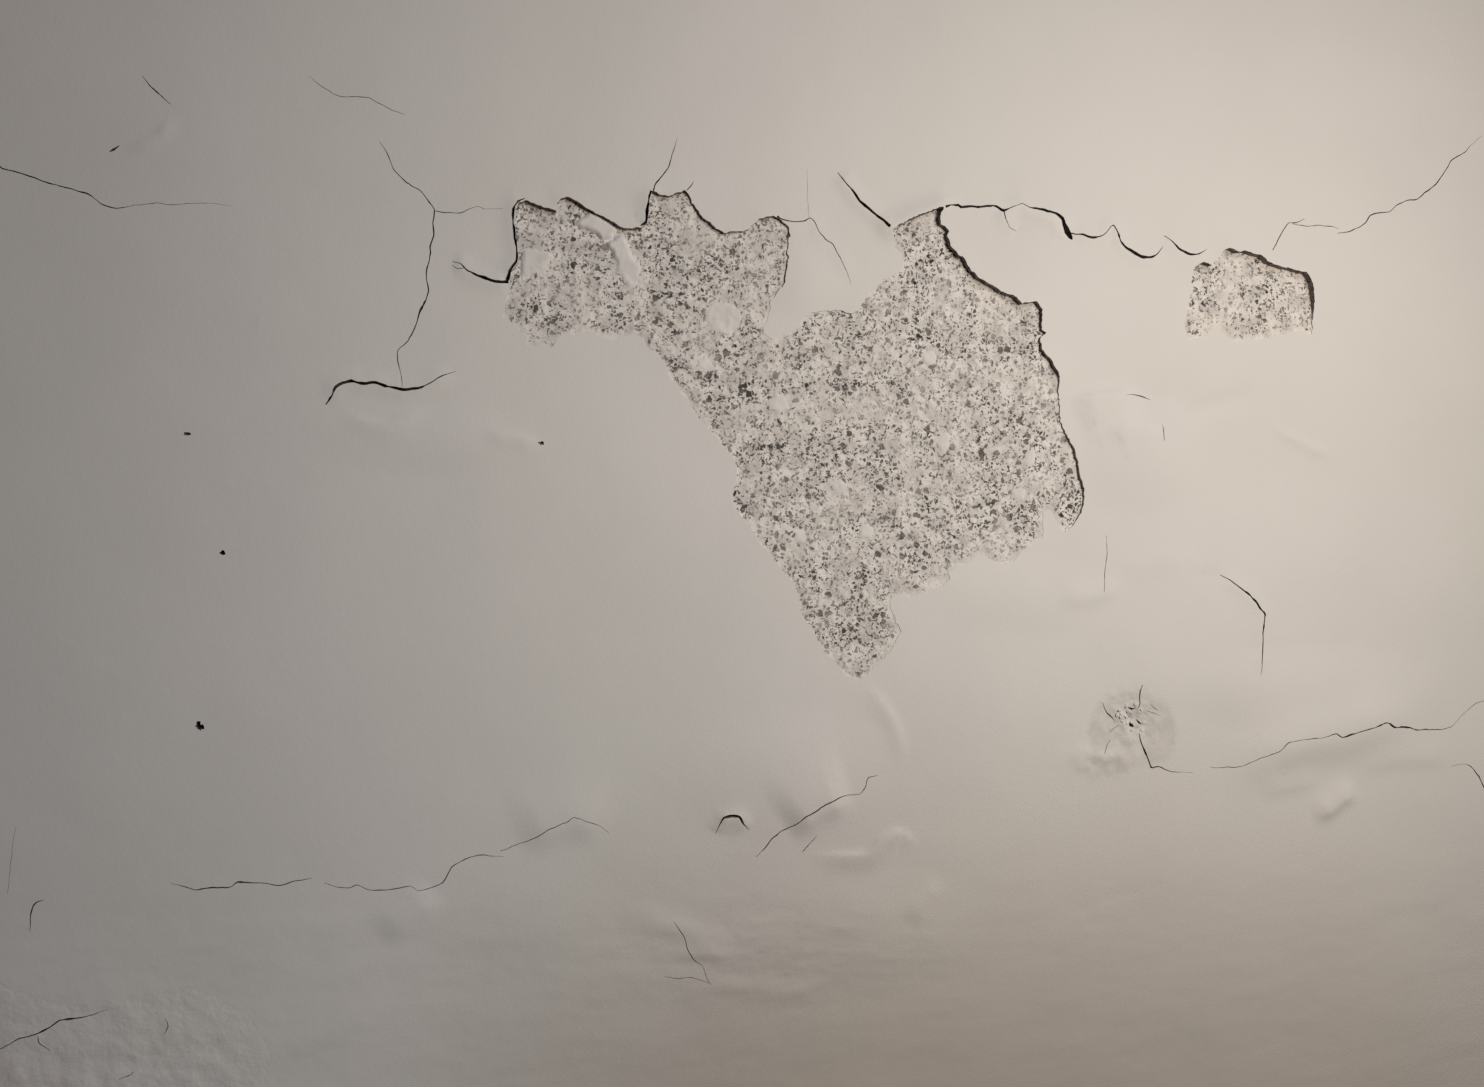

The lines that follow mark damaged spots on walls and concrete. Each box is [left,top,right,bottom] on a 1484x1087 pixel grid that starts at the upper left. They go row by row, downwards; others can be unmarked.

crack [0,166,229,209]
crack [326,144,525,405]
crack [777,173,891,283]
crack [945,203,1207,259]
spalling [1184,248,1315,342]
crack [1273,138,1479,250]
spalling [503,190,1085,680]
crack [1221,575,1266,672]
crack [1102,685,1483,773]
crack [171,817,609,891]
crack [715,775,877,856]
peeling [0,984,272,1087]